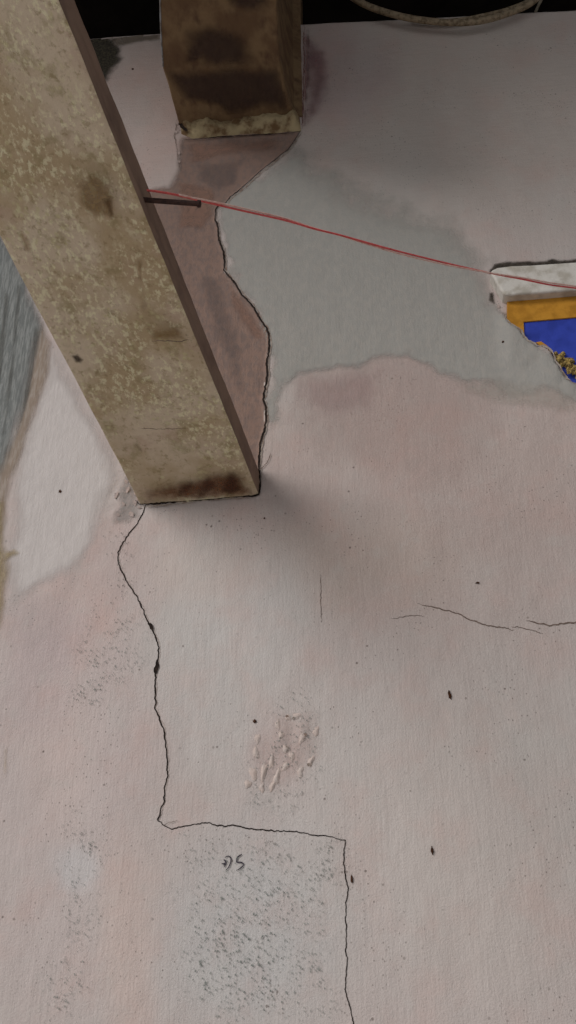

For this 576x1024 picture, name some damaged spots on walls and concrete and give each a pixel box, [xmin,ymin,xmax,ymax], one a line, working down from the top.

flaking render [150,132,299,468]
crack [117,505,354,1024]
crack [391,603,576,633]